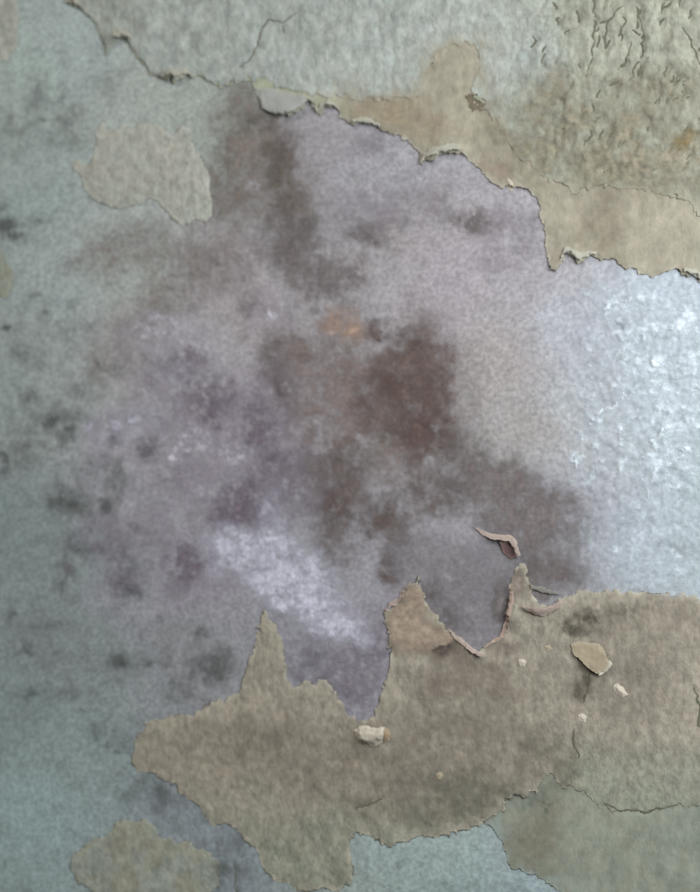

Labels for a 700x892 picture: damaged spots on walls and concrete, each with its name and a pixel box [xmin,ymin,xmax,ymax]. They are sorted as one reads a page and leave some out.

leakage [208,85,363,294]
peeling [64,0,700,282]
leakage [457,211,500,233]
crack [530,36,547,64]
crack [552,0,700,173]
leakage [86,274,590,699]
leakage [571,274,700,594]
peeling [131,527,700,892]
crack [604,802,678,813]